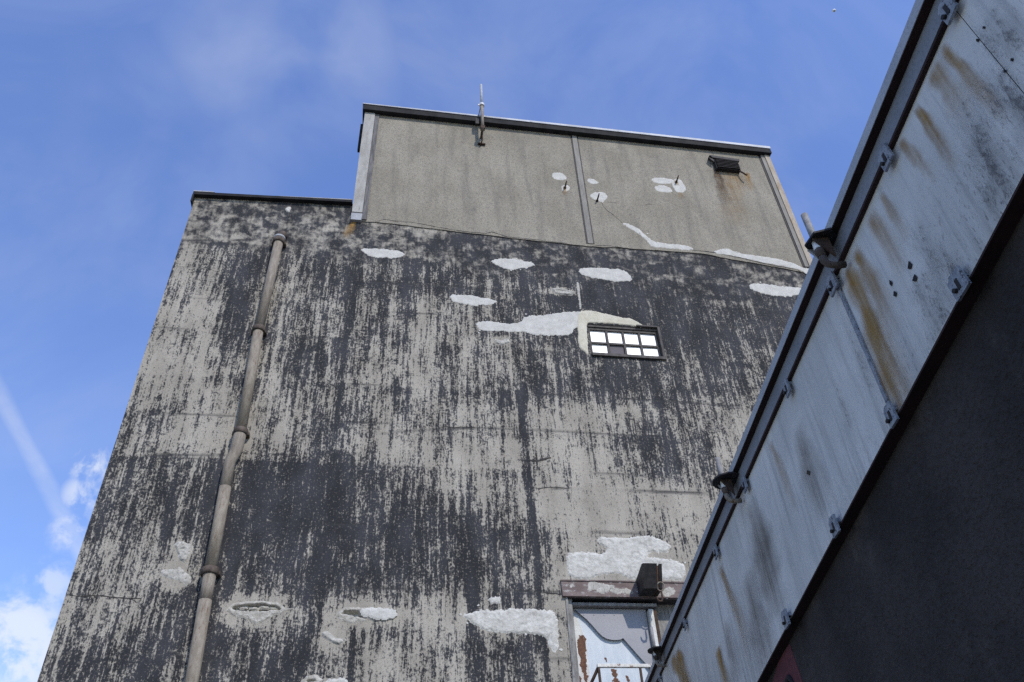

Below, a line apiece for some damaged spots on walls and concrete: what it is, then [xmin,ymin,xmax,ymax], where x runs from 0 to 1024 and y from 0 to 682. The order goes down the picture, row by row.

corrosion [917,109,938,137]
corrosion [846,252,894,395]
spalling [225,601,291,624]
spalling [336,607,398,623]
corrosion [577,635,589,682]